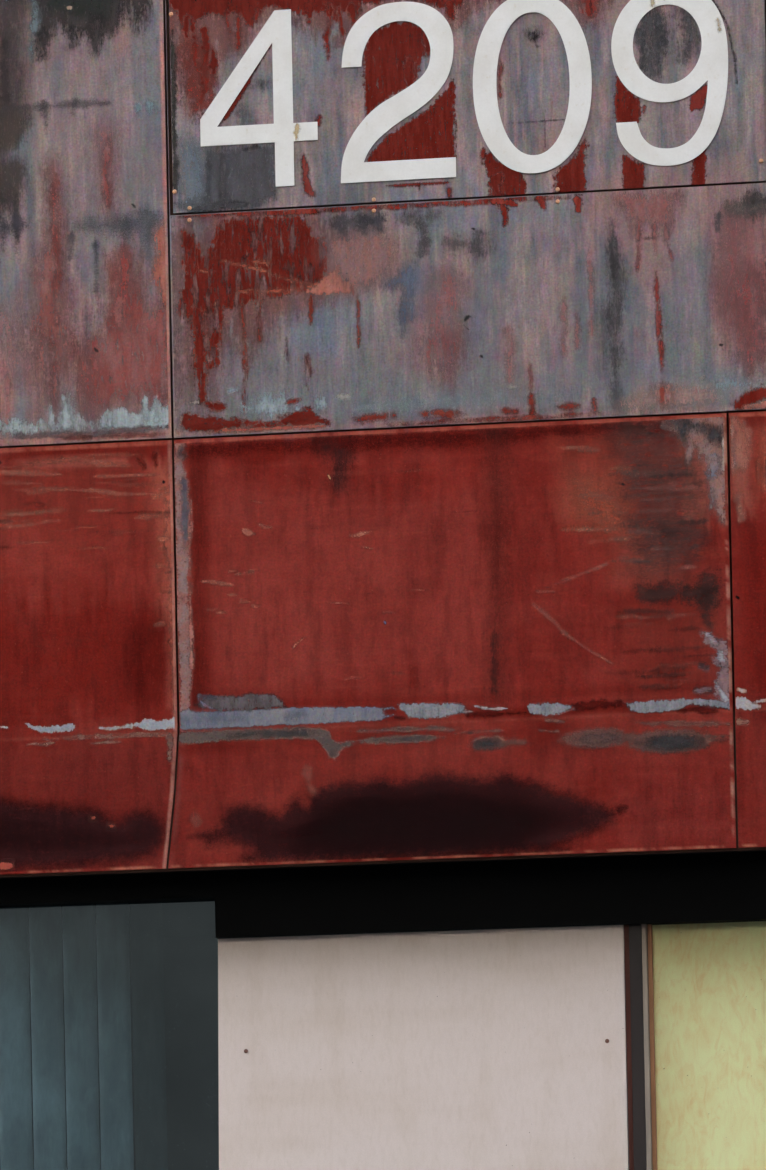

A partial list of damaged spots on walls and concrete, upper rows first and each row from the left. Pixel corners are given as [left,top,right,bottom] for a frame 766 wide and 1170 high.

rust [170,0,500,123]
leakage [0,0,153,241]
leakage [68,211,156,292]
rust [29,155,600,433]
leakage [0,393,169,439]
rust [734,384,766,410]
peeling [25,723,75,733]
rust [454,711,519,734]
peeling [527,702,574,716]
rust [639,707,749,737]
leakage [0,799,164,870]
leakage [207,774,614,862]